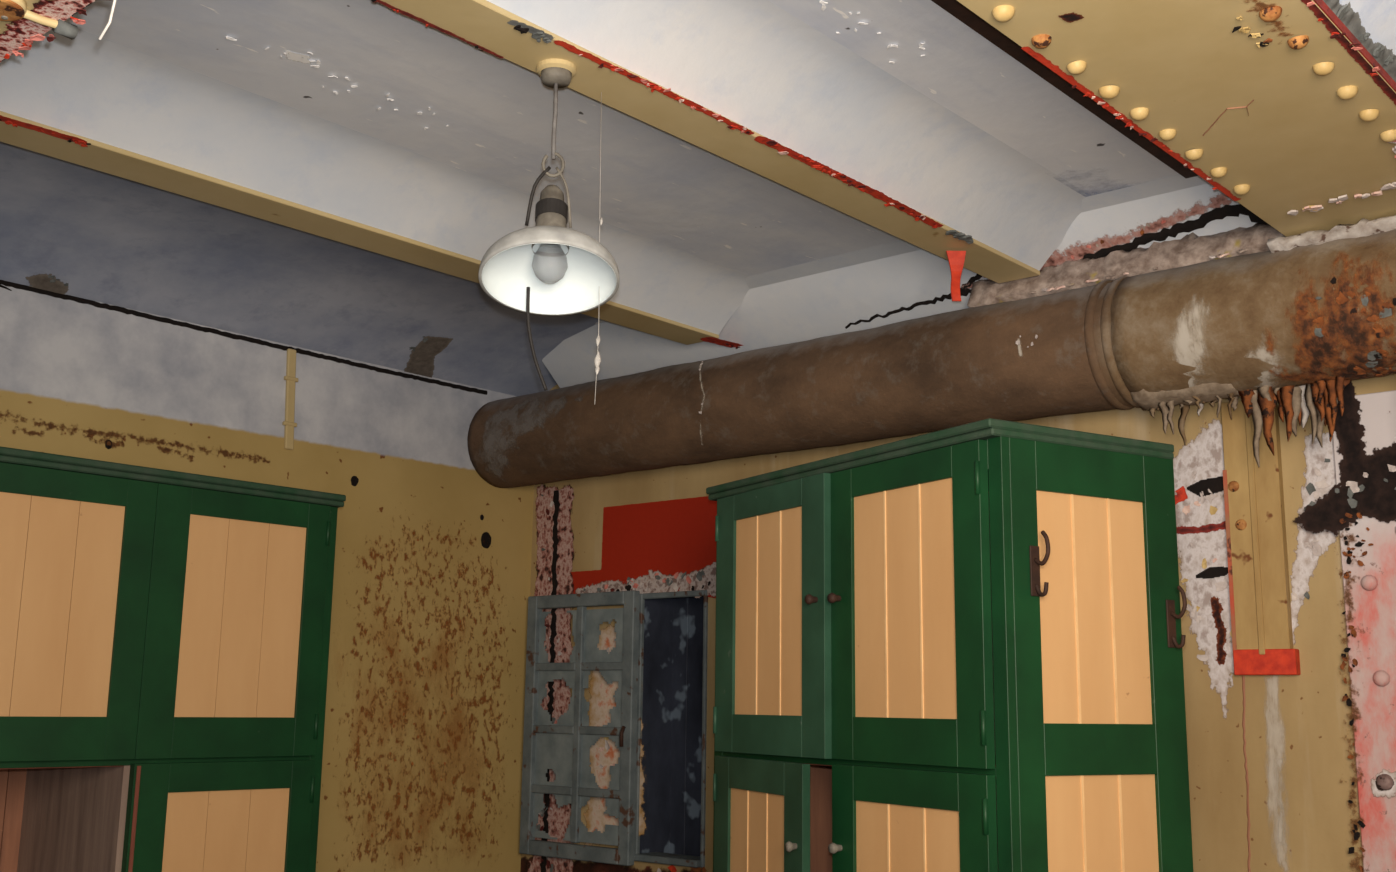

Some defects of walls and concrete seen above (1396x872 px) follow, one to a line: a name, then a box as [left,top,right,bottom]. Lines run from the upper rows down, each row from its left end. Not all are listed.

peeling [0,115,91,147]
peeling [0,0,96,62]
crack [845,274,983,329]
crack [1083,204,1268,259]
rust [1232,0,1292,48]
rust [1238,253,1396,467]
rust [333,517,512,872]
peeling [528,671,620,872]
peeling [534,484,716,724]
peeling [1173,420,1234,718]
spalling [1291,380,1396,645]
peeling [1371,769,1396,798]